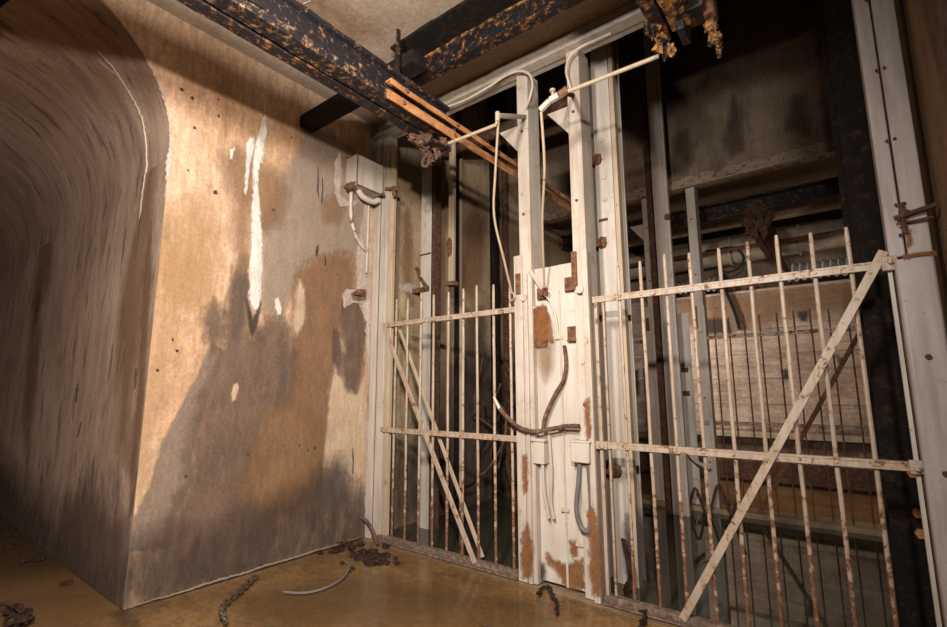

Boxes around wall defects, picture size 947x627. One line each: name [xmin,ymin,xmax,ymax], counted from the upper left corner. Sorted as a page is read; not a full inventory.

water stain [0,106,366,610]
peeling [298,152,372,513]
corrosion [535,303,554,372]
corrosion [520,506,602,597]